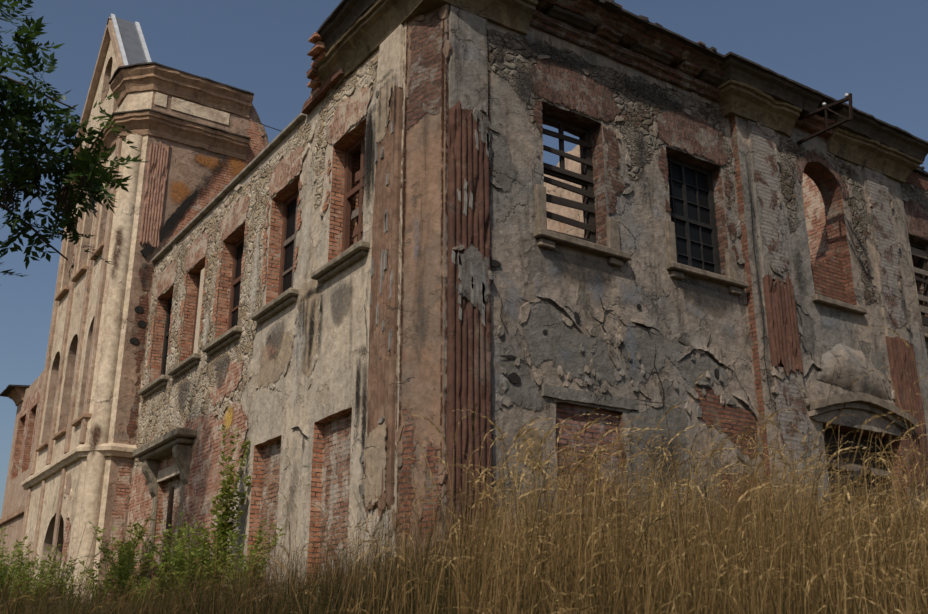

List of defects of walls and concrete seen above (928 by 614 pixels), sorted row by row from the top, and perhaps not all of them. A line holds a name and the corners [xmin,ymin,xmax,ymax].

peeling [457,179,473,216]
flaking render [778,137,928,330]
flaking render [101,52,394,602]
flaking render [452,244,501,327]
crack [493,282,527,362]
flaking render [795,298,816,356]
flaking render [359,406,448,539]